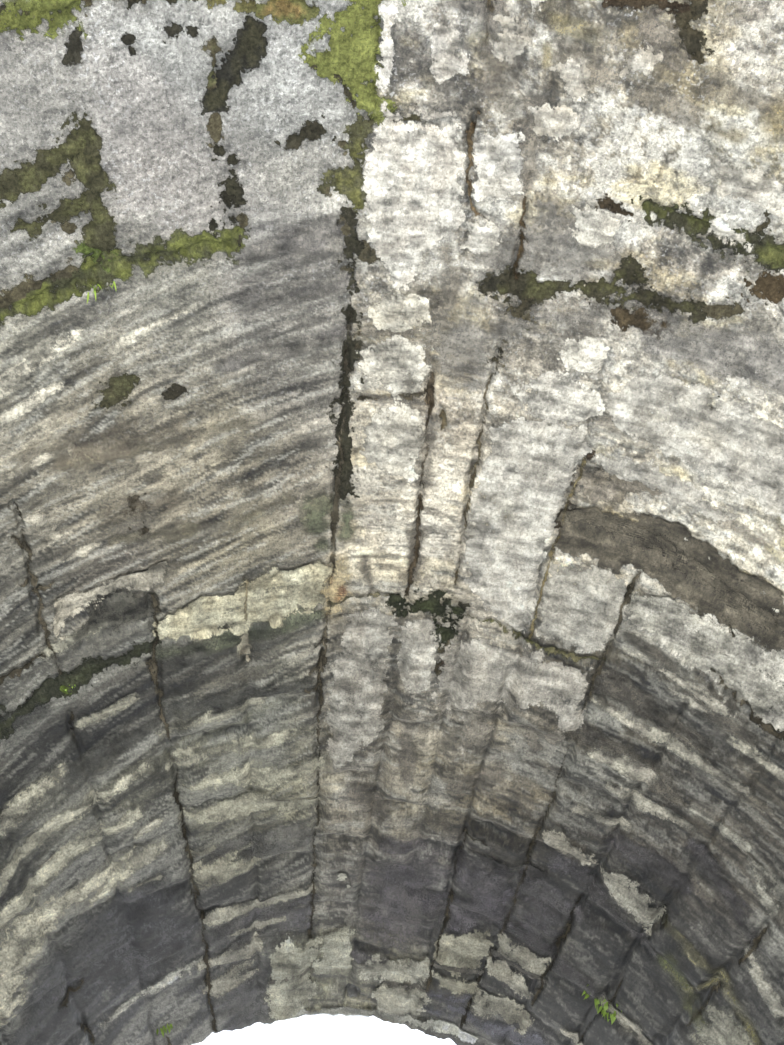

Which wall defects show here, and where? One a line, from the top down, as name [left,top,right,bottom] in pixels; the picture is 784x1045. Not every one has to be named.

crack [465,111,489,221]
water stain [447,0,572,191]
water stain [0,382,63,428]
crack [0,502,63,685]
water stain [108,307,191,357]
spalling [50,560,332,662]
water stain [213,201,618,388]
crack [454,361,498,585]
peeling [324,335,784,770]
crack [467,458,644,710]
water stain [615,278,784,395]
crack [146,594,218,1032]